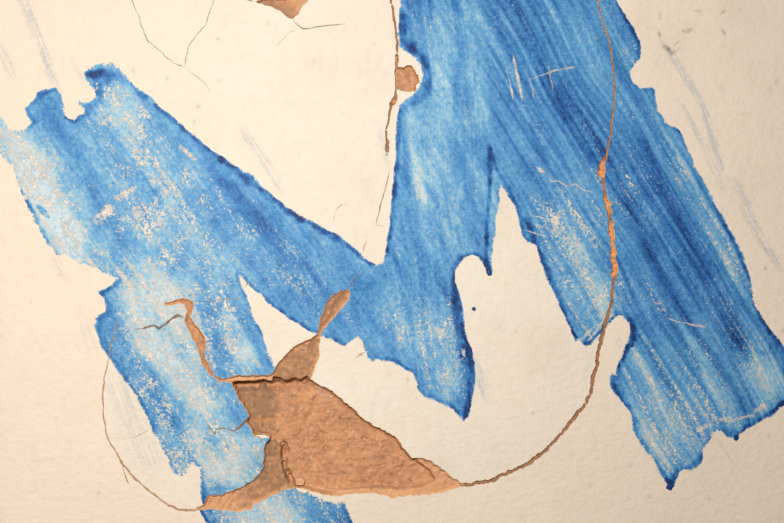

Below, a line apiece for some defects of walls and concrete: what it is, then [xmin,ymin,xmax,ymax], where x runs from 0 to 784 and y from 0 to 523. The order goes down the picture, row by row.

crack [133,0,214,87]
flaking render [256,0,308,19]
crack [390,0,399,53]
flaking render [394,54,420,92]
crack [385,87,398,155]
crack [461,0,619,487]
crack [140,314,184,329]
crack [102,319,200,511]
flaking render [164,290,465,512]